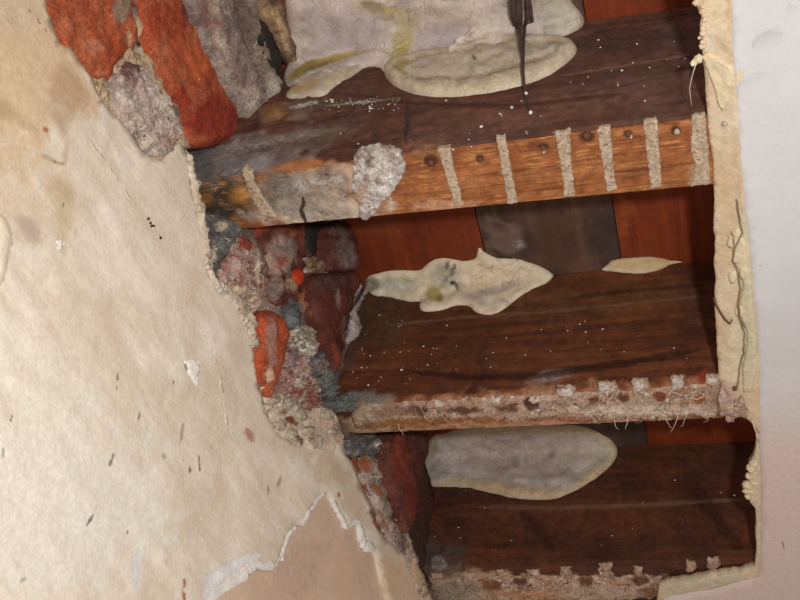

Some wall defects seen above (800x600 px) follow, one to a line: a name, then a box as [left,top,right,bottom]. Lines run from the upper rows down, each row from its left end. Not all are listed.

spalling [692,0,708,52]
water stain [283,206,351,219]
water stain [291,174,347,201]
spalling [46,0,432,600]
spalling [717,228,757,423]
spalling [742,460,759,501]